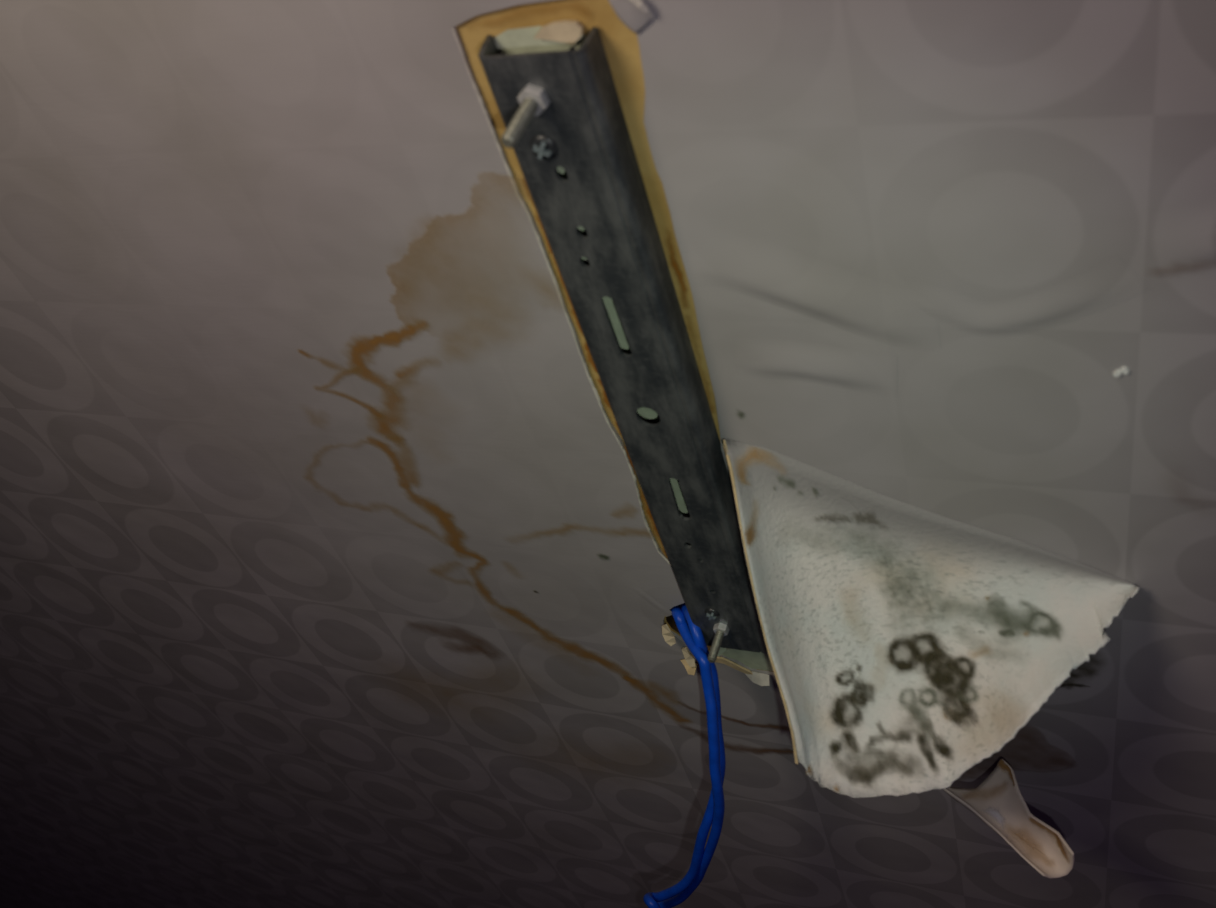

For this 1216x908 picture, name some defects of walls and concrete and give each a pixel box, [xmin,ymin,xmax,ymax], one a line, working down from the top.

peeling [452,0,1140,879]
damp [333,322,702,722]
damp [745,525,755,545]
damp [998,612,1059,637]
damp [1060,658,1097,687]
damp [830,634,977,769]
damp [847,764,884,784]